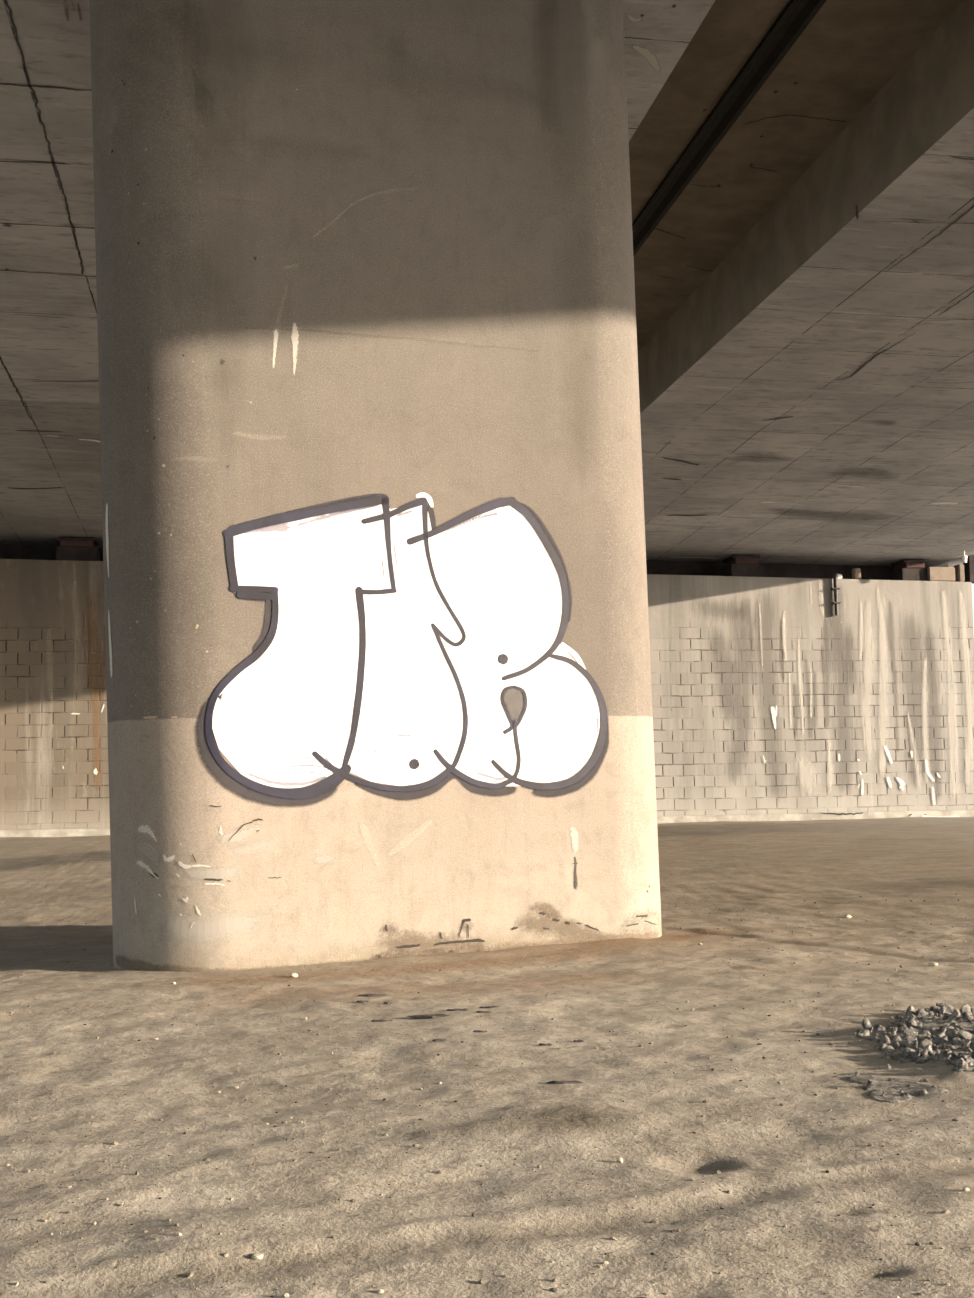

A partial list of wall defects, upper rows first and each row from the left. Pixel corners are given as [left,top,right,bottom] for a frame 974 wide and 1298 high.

crack [0,0,97,318]
crack [855,204,974,271]
crack [836,291,974,380]
crack [0,356,88,432]